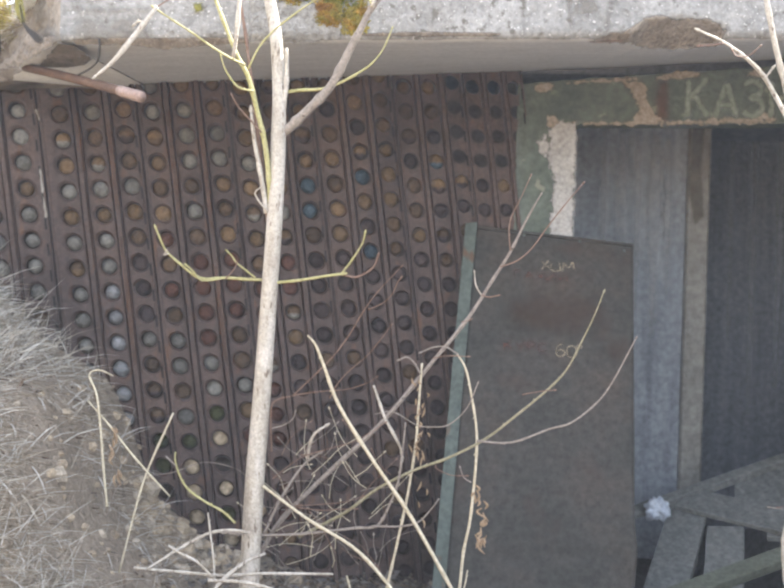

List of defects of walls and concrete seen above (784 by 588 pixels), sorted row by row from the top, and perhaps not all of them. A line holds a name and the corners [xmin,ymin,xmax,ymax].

spalling [0,0,270,70]
spalling [276,0,372,43]
spalling [595,15,726,50]
peeling [655,70,700,81]
peeling [534,77,776,237]